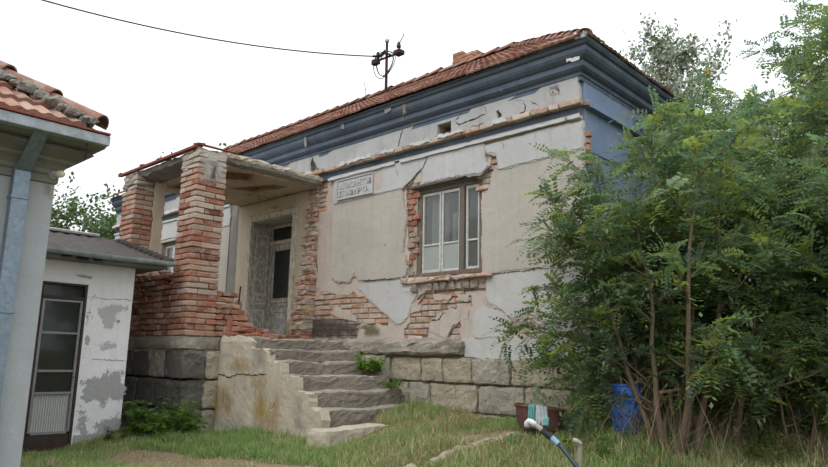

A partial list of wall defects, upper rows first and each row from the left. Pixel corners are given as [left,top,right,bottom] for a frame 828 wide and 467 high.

spalling [313,120,593,340]
peeling [86,294,127,328]
peeling [74,370,128,435]